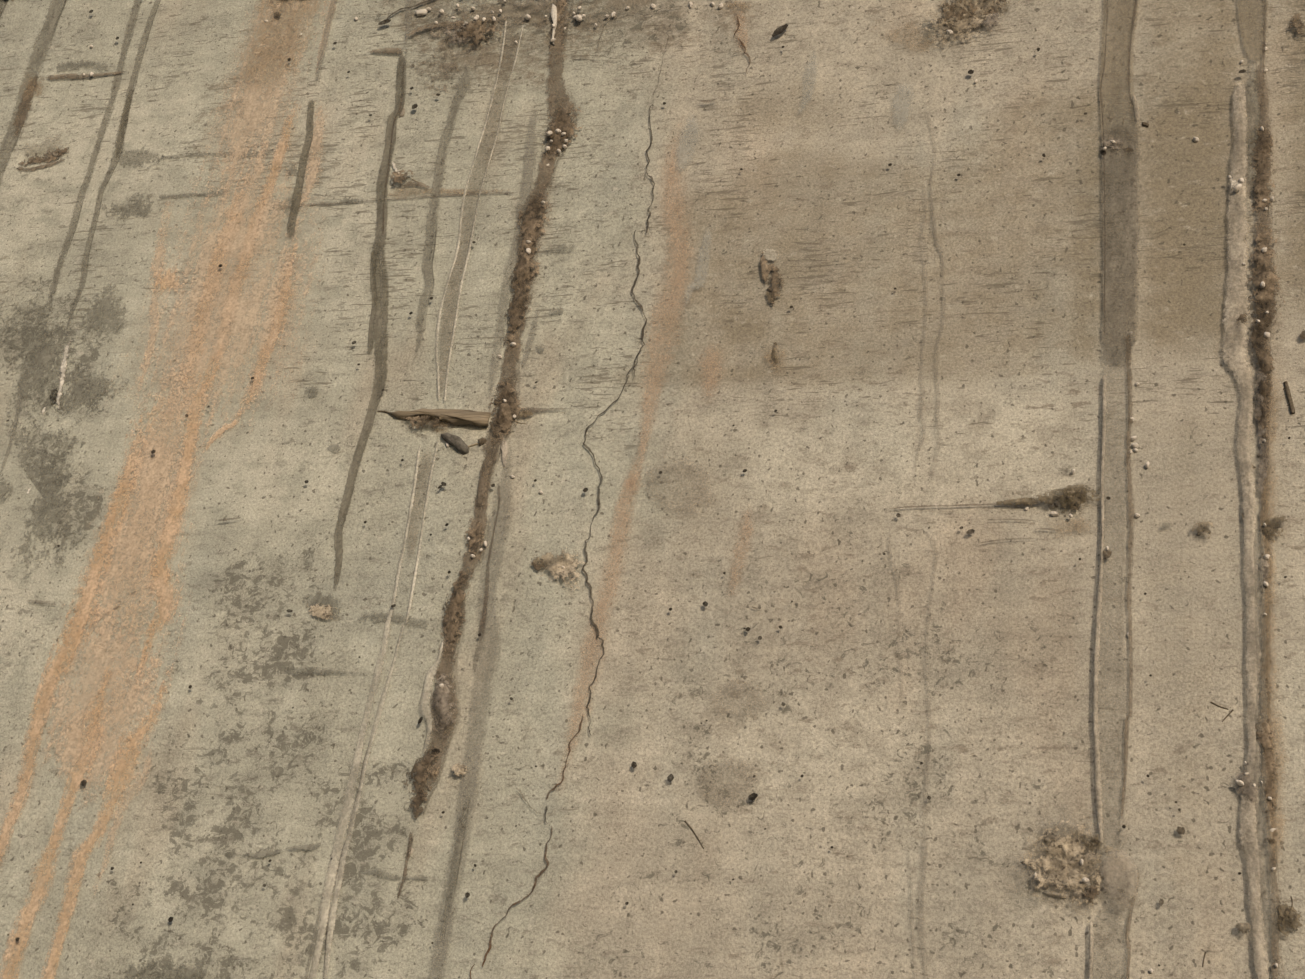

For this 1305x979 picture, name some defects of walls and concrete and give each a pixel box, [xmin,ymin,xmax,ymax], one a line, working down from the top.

leakage [476,21,523,166]
rust [3,870,50,978]
rust [43,813,117,979]
rust [0,0,326,856]
leakage [306,447,437,979]
crack [470,6,680,979]